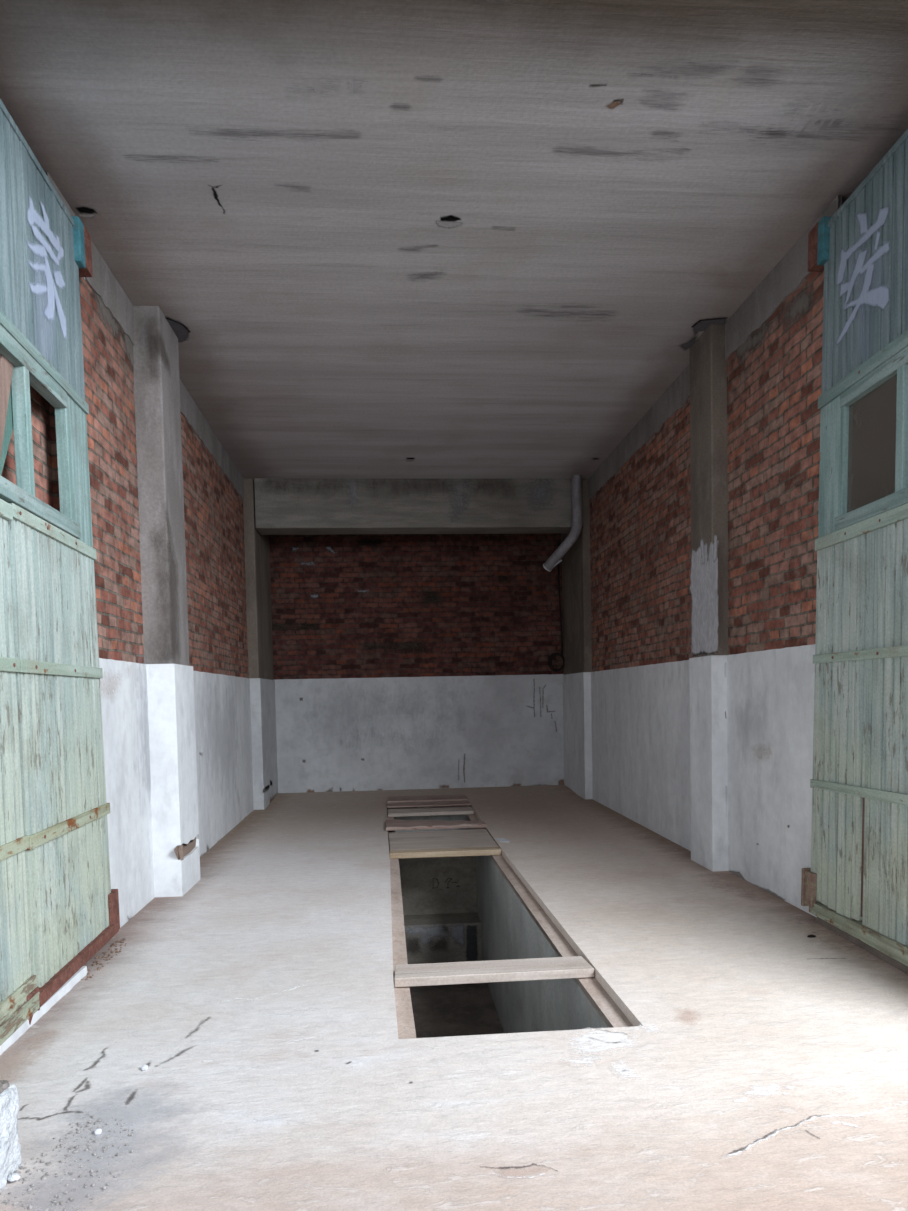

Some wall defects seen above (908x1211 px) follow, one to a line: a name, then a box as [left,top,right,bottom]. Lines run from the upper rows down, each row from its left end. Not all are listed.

crack [126,985,301,1104]
crack [20,1050,105,1120]
crack [729,1108,888,1156]